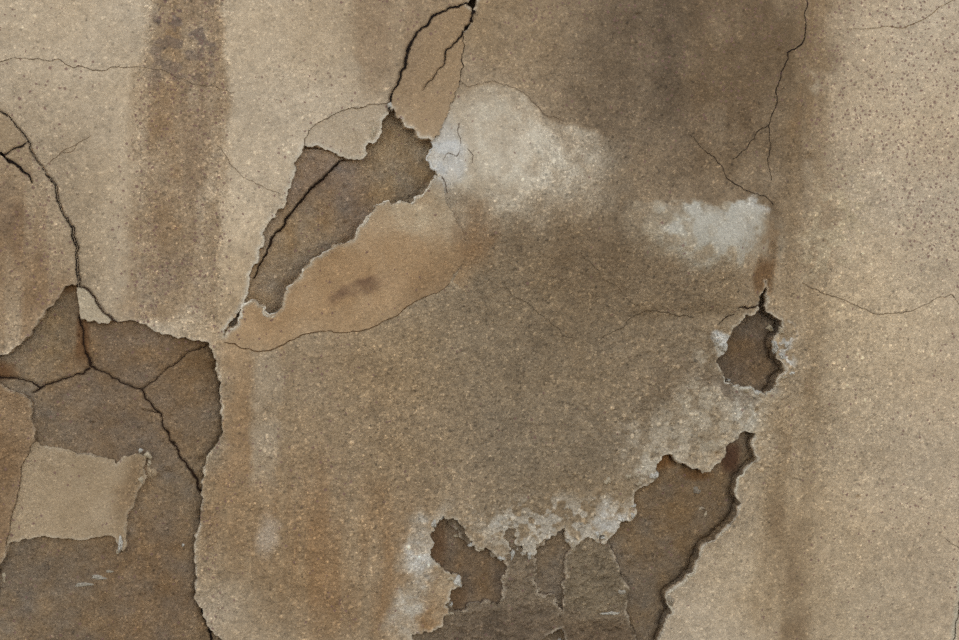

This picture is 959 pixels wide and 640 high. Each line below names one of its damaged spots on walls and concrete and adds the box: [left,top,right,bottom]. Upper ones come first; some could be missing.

peeling [0,110,35,184]
crack [0,57,234,93]
damp [109,0,240,333]
spalling [223,4,472,337]
crack [303,2,561,193]
crack [690,1,808,205]
crack [0,111,448,492]
damp [198,0,886,640]
spalling [713,281,795,395]
spalling [0,284,225,640]
spalling [412,431,759,640]